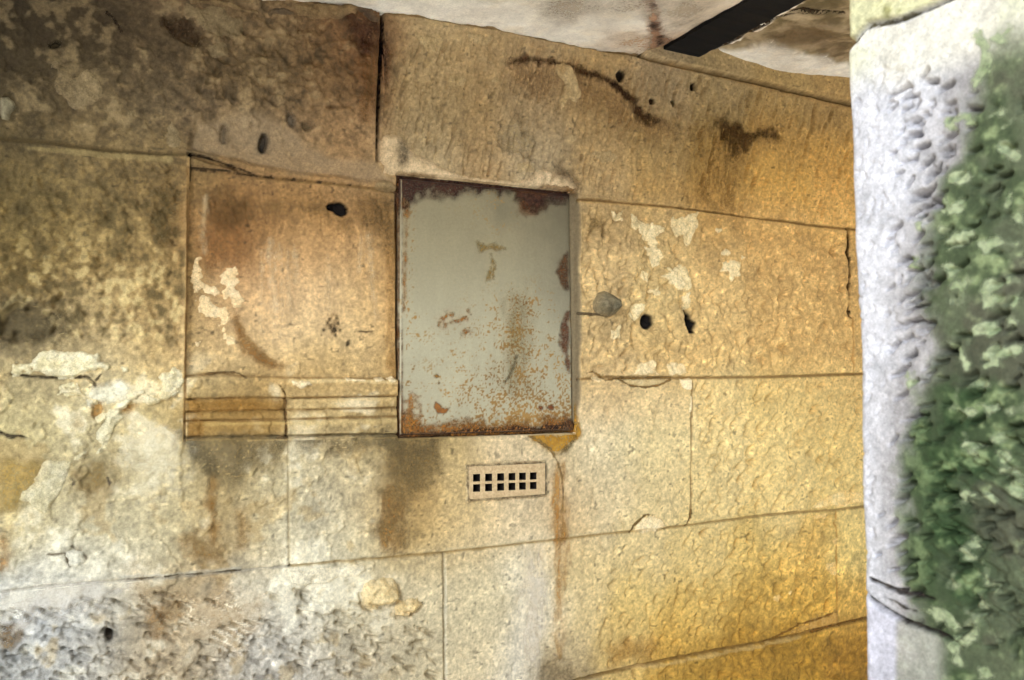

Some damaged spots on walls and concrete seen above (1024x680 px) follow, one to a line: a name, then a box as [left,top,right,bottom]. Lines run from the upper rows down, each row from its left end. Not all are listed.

damp [510,55,661,126]
damp [715,121,779,156]
peeling [2,301,185,425]
rust [394,174,581,452]
damp [186,437,285,510]
damp [330,434,437,548]
rust [552,465,565,604]